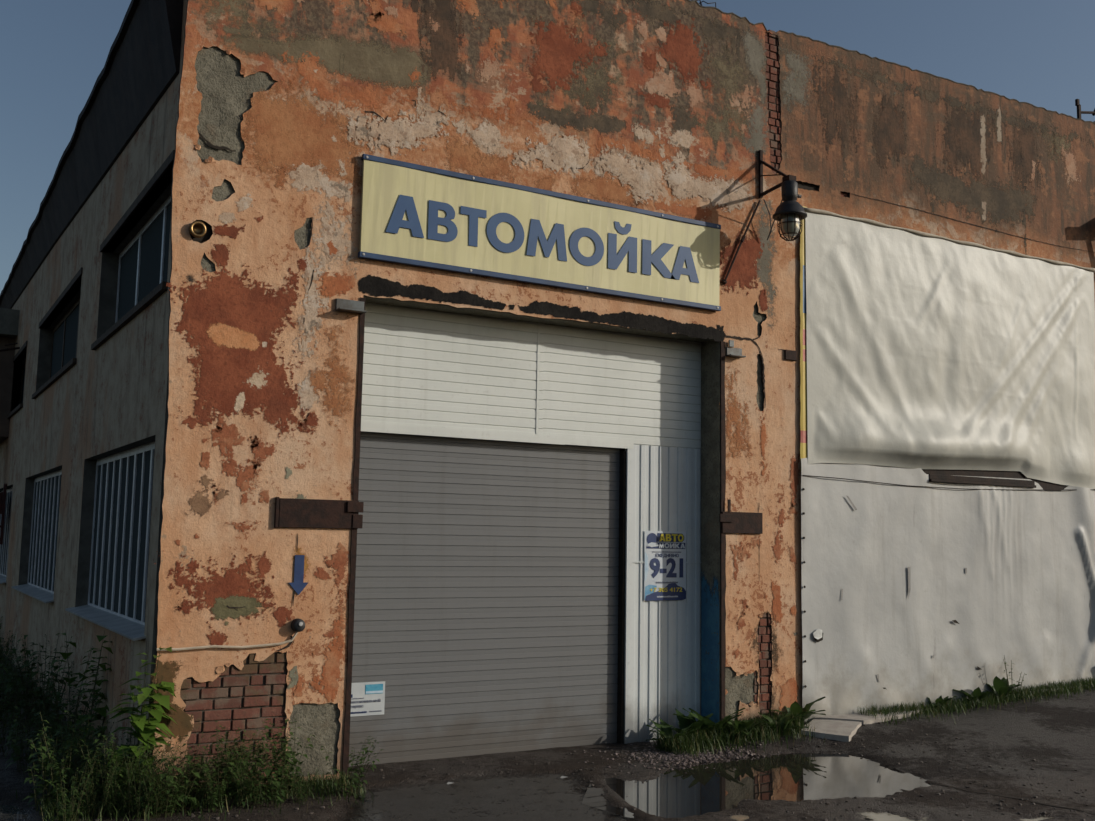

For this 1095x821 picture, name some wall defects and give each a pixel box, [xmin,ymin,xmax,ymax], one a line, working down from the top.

leakage [197,0,464,89]
peeling [195,47,543,190]
peeling [571,176,713,221]
leakage [524,0,768,160]
leakage [779,47,1095,255]
peeling [166,180,358,517]
peeling [167,533,294,649]
peeling [226,520,257,534]
flaking render [180,542,350,783]
flaking render [725,453,801,733]